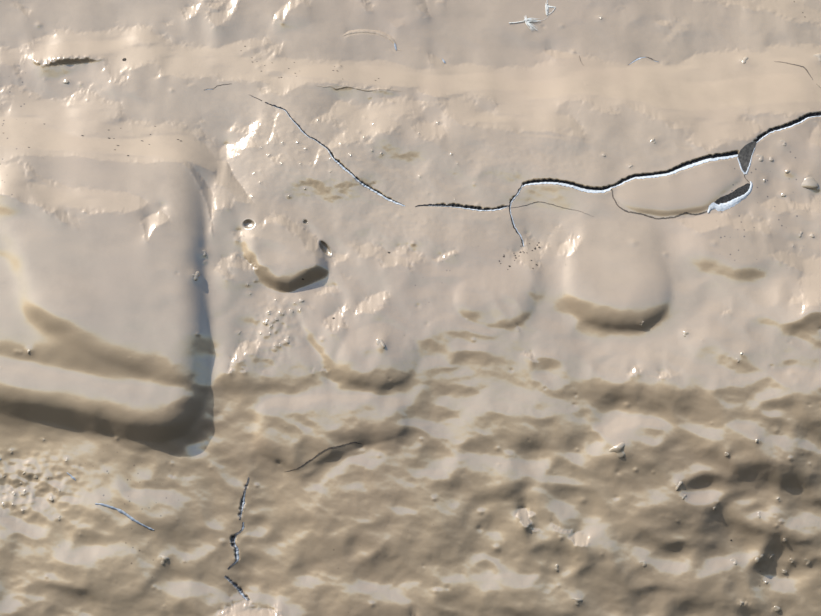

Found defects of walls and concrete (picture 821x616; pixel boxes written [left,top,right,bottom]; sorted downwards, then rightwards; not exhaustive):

crack [252,96,821,246]
peeling [616,141,757,216]
crack [224,477,249,601]